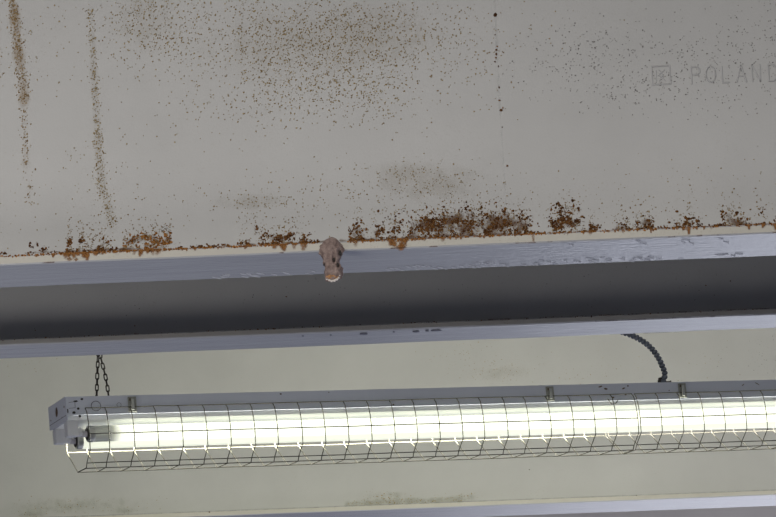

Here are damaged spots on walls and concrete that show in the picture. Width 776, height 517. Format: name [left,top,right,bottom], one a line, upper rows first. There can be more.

rust [0,0,776,263]